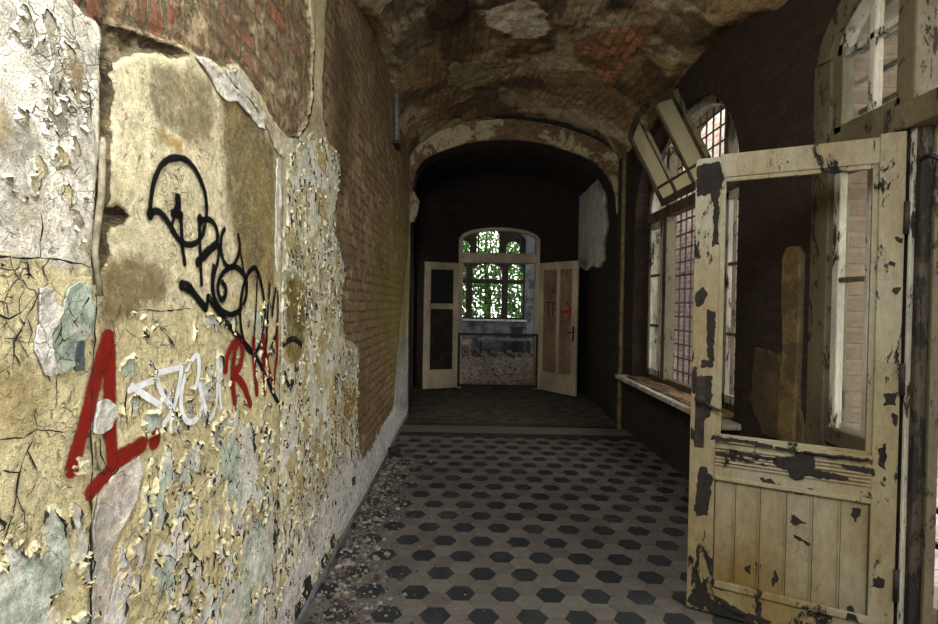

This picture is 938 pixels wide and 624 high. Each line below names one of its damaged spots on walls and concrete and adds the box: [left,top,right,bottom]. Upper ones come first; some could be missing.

peeling [482,0,552,39]
crack [0,214,195,624]
flaking render [0,0,420,624]